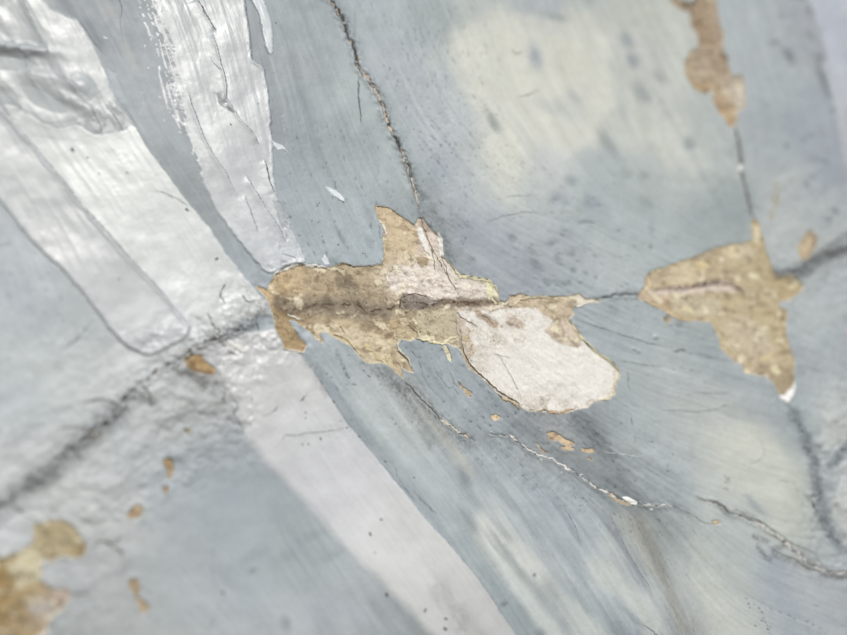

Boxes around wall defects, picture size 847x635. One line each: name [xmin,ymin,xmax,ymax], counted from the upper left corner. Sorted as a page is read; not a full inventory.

peeling [670,0,746,128]
crack [735,127,753,218]
peeling [184,354,216,375]
crack [0,0,522,523]
peeling [256,205,620,414]
peeling [637,218,803,403]
peeling [797,231,818,261]
peeling [547,431,595,460]
crack [490,408,847,588]
peeling [0,519,86,635]